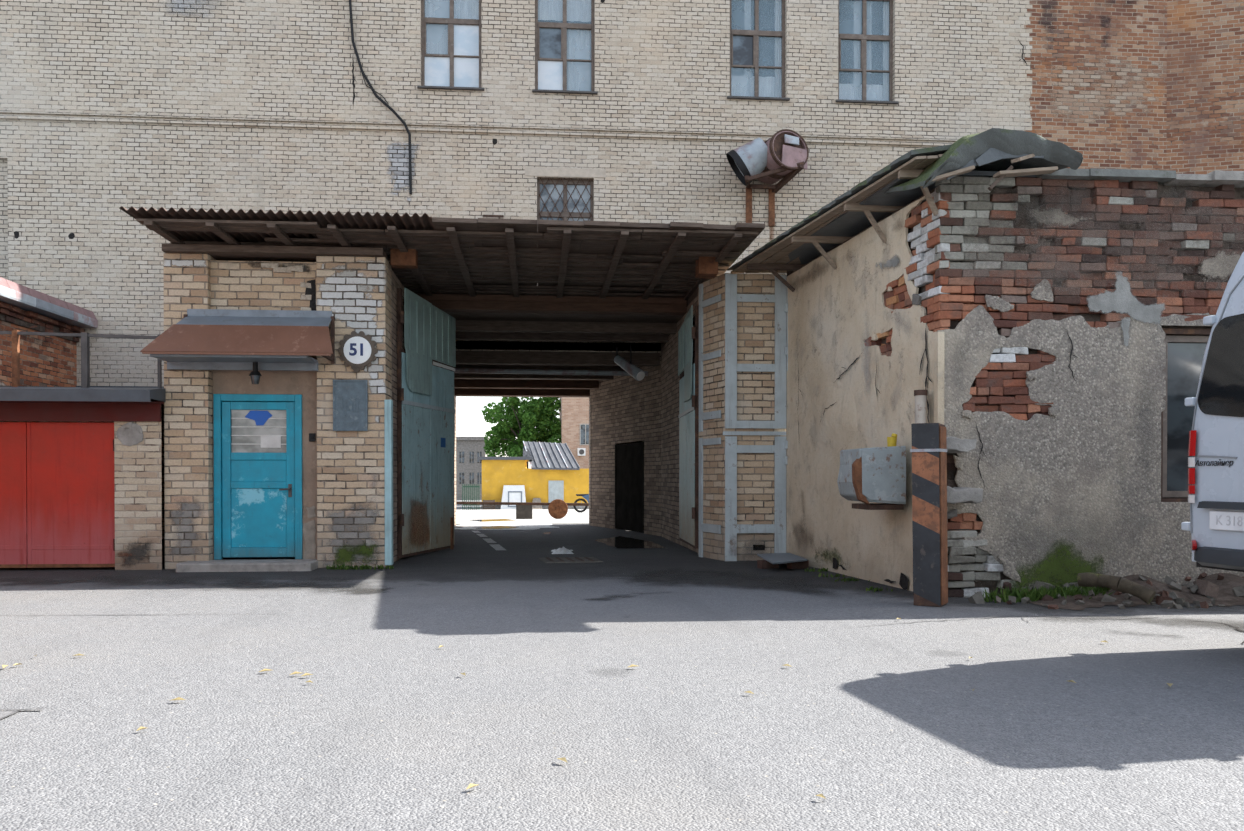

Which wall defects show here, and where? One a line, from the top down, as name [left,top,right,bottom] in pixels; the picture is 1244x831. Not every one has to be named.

spalling [864,330,892,356]
spalling [883,176,1244,421]